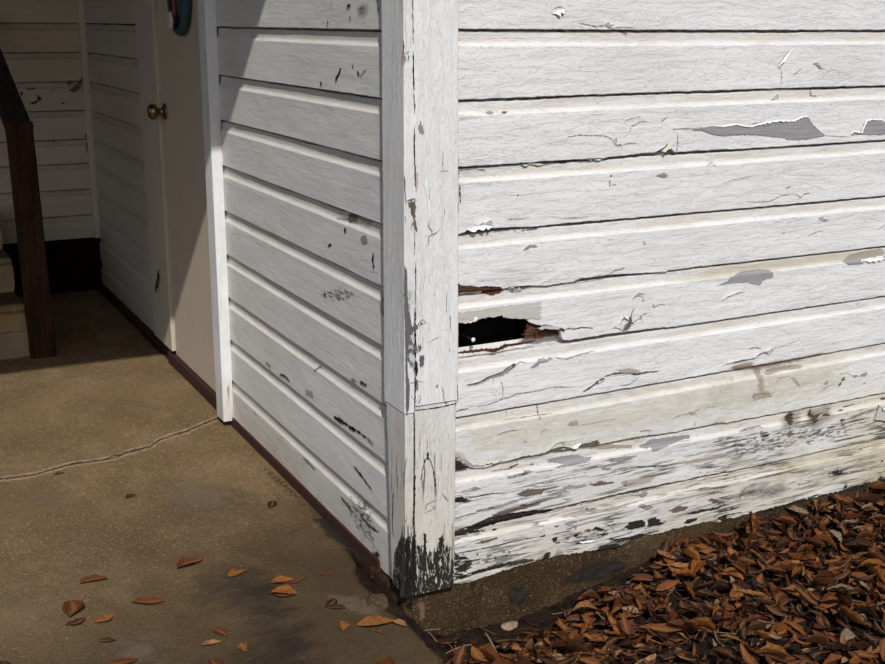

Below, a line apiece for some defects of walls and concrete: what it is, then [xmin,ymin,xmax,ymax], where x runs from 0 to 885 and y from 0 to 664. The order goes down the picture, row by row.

peeling [678,116,885,140]
peeling [841,248,885,265]
peeling [717,269,774,302]
peeling [752,364,803,401]
crack [0,416,221,482]
peeling [455,423,848,512]
spalling [552,520,615,544]
leakage [416,528,535,595]